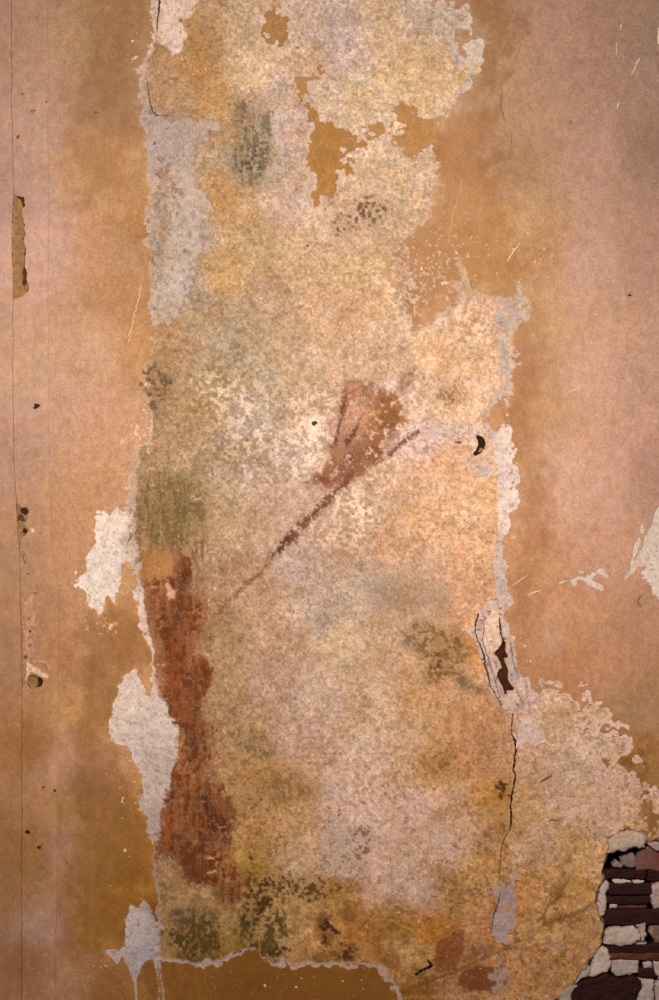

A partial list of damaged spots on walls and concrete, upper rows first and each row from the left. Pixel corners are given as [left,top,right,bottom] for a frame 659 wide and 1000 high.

peeling [12,194,29,300]
peeling [397,262,437,317]
flaking render [74,506,127,614]
leakage [138,472,205,560]
flaking render [466,595,528,714]
flaking render [109,668,179,841]
corrosion [140,546,250,905]
crack [490,713,517,932]
flaking render [105,899,156,1000]
leakage [161,920,220,962]
leakage [240,871,342,957]
flaking render [575,867,605,982]